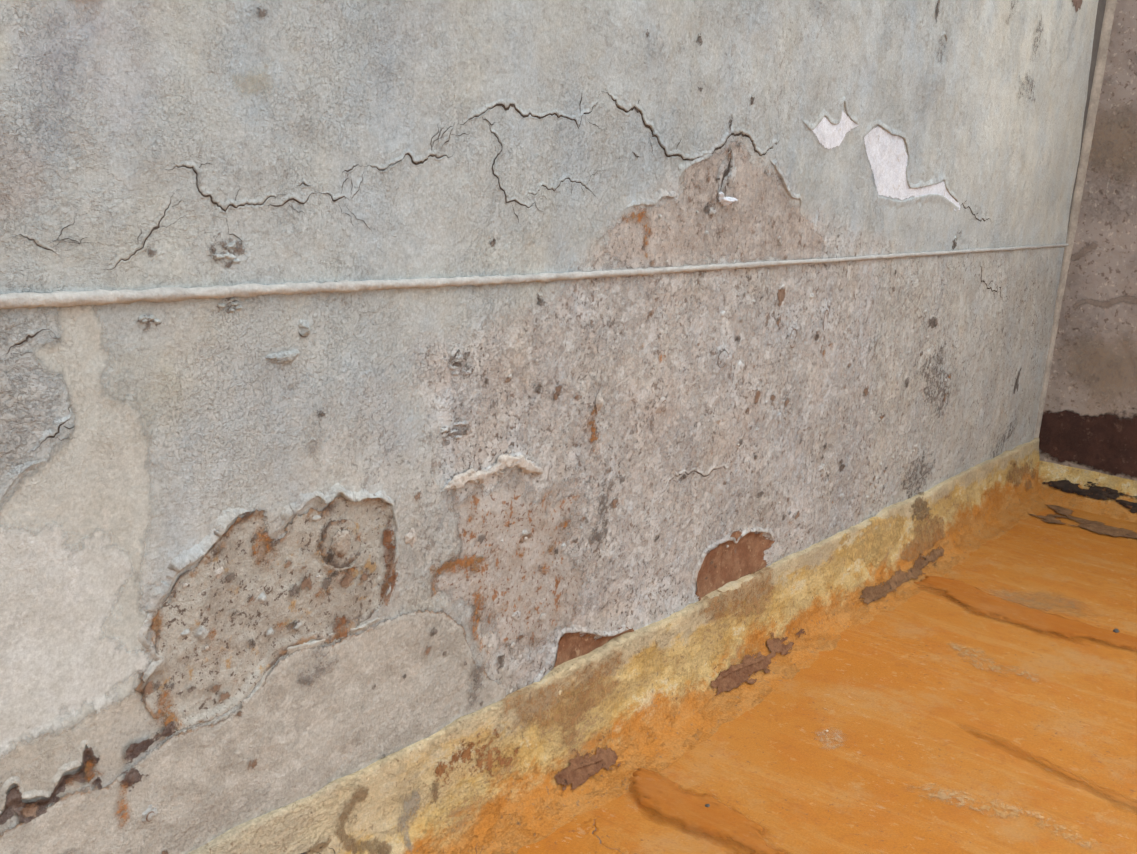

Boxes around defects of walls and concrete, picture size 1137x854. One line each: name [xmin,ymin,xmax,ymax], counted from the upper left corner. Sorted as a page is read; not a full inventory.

crack [14,91,781,271]
peeling [802,96,960,214]
peeling [905,300,938,388]
peeling [534,383,562,400]
peeling [746,383,790,422]
peeling [0,305,402,792]
spalling [432,450,634,706]
spalling [694,526,775,601]
spalling [0,740,102,825]
corrosion [435,729,518,787]